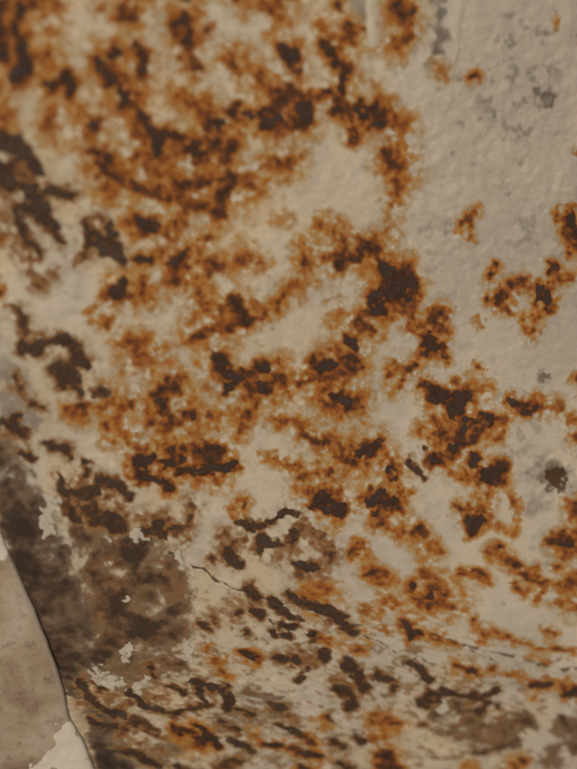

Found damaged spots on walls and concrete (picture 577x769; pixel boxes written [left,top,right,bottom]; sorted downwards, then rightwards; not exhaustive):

corrosion [0,0,425,545]
corrosion [204,106,577,722]
peeling [0,533,9,561]
crack [191,565,285,604]
corrosion [193,607,221,635]
crack [430,633,577,678]
corrosion [72,641,359,769]
peeling [29,721,94,769]
corrosion [349,708,410,769]
corrosion [459,758,481,769]
corrosion [499,750,534,769]